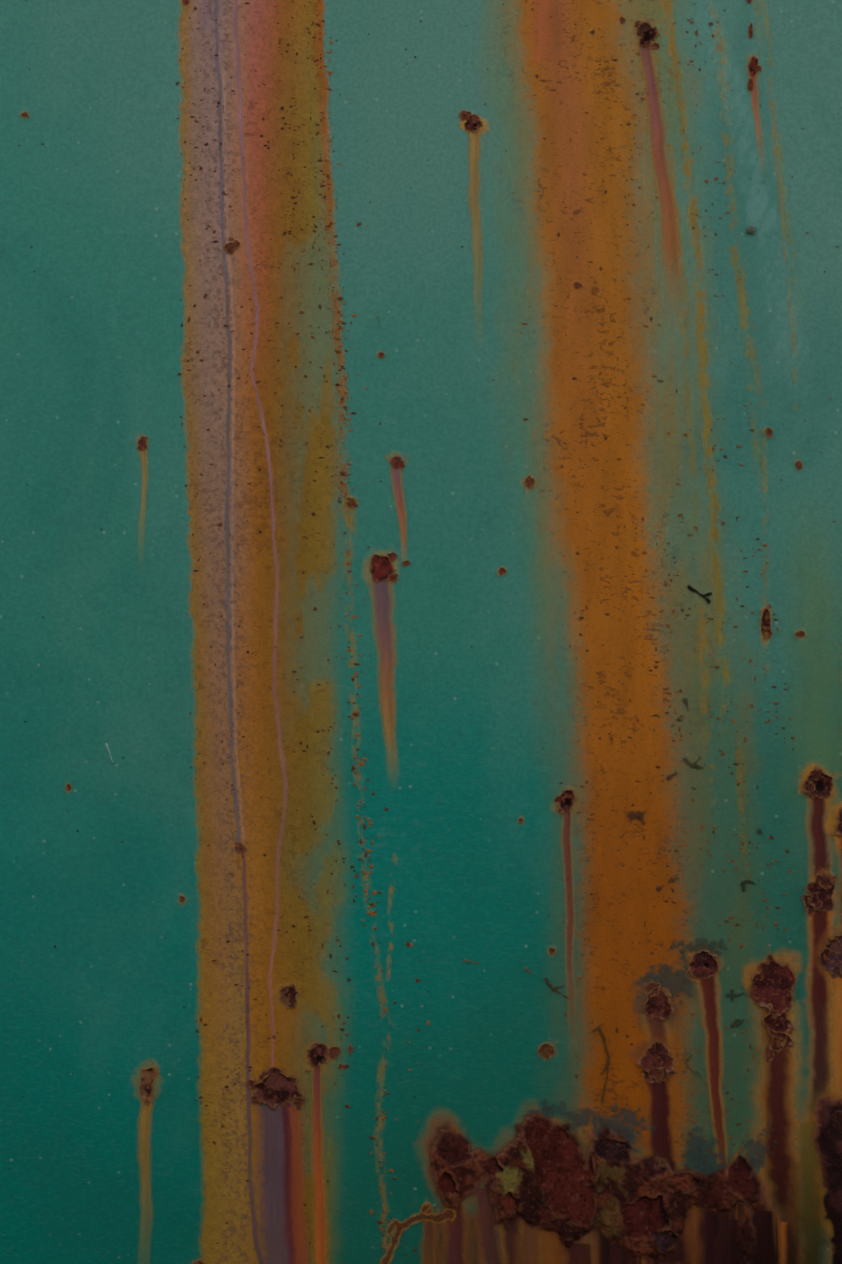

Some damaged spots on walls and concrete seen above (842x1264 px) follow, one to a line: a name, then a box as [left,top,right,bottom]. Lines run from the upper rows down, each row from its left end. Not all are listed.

rust [136,435,148,531]
rust [175,0,842,1264]
rust [135,1060,160,1240]